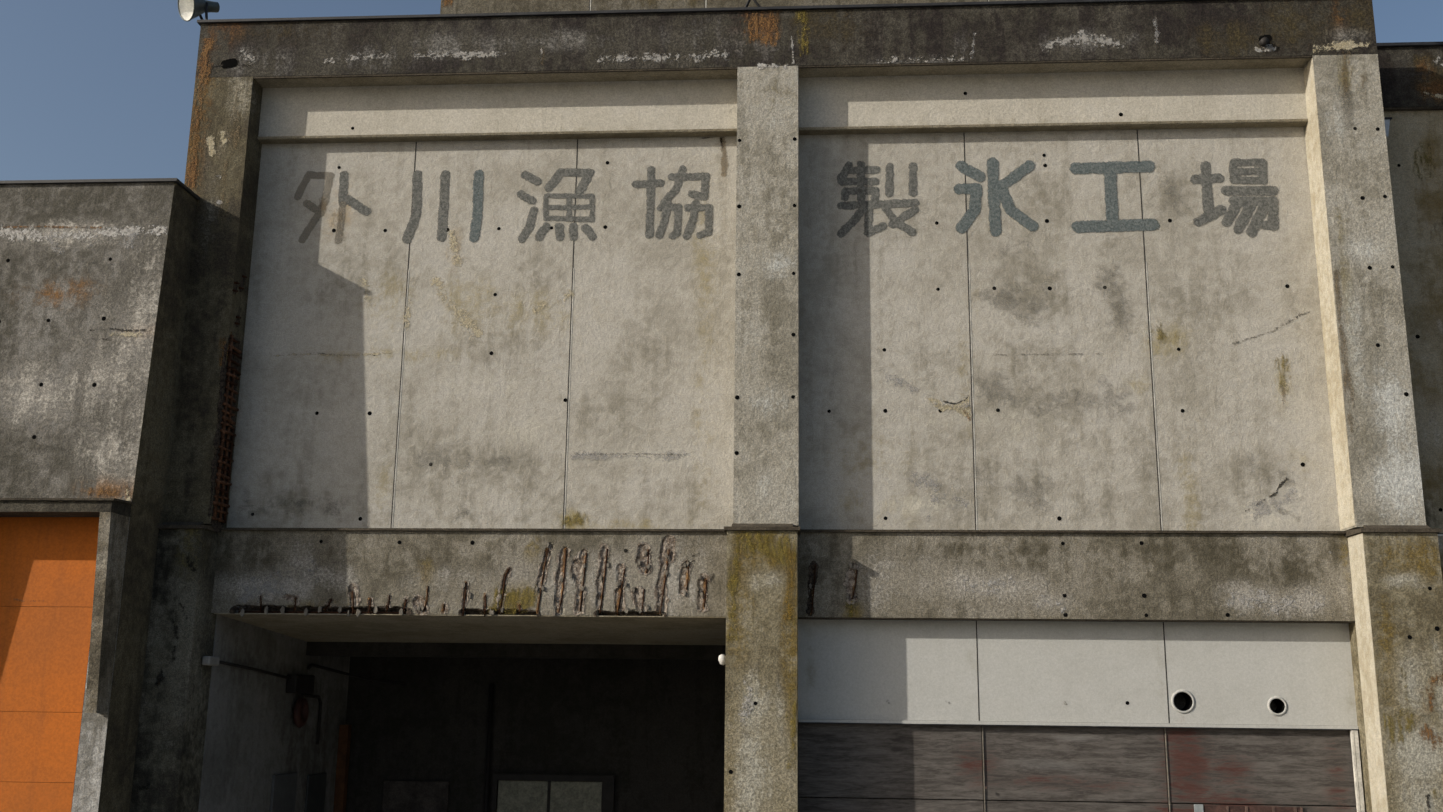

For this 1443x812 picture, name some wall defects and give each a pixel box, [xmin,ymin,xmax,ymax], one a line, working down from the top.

corrosion [208,332,242,533]
crack [1245,477,1288,538]
spalling [229,534,710,618]
spalling [806,561,819,616]